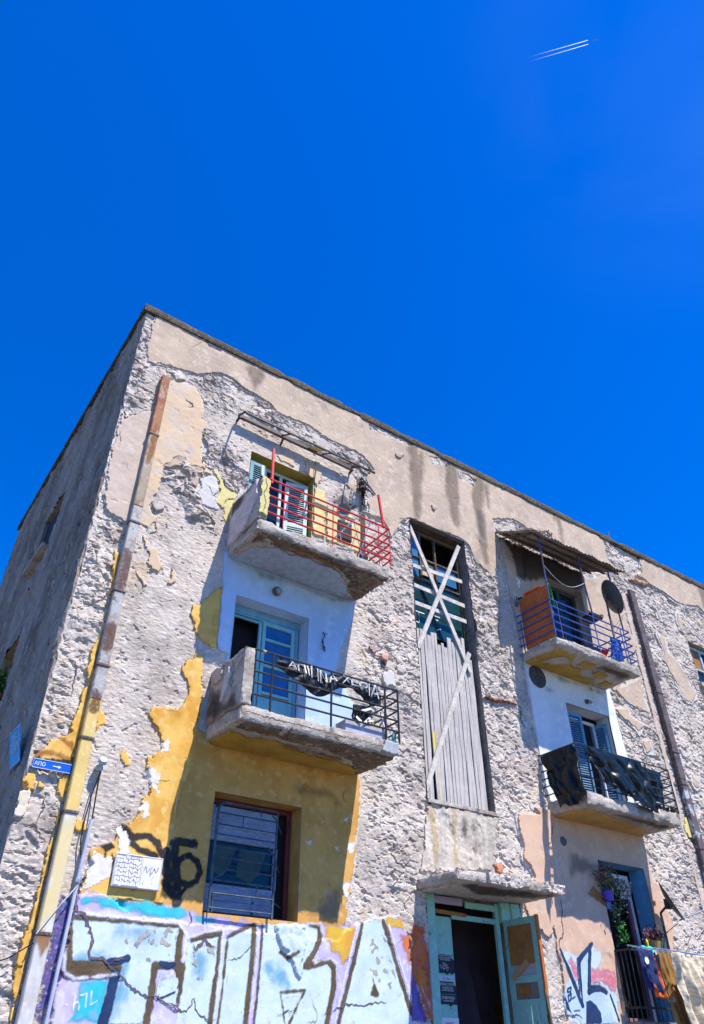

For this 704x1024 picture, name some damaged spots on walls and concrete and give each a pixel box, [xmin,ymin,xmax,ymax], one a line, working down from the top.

flaking render [122,313,372,535]
flaking render [467,564,501,658]
peeling [9,551,120,1024]
peeling [78,587,223,904]
flaking render [482,695,518,705]
peeling [525,649,612,687]
leakage [430,805,466,869]